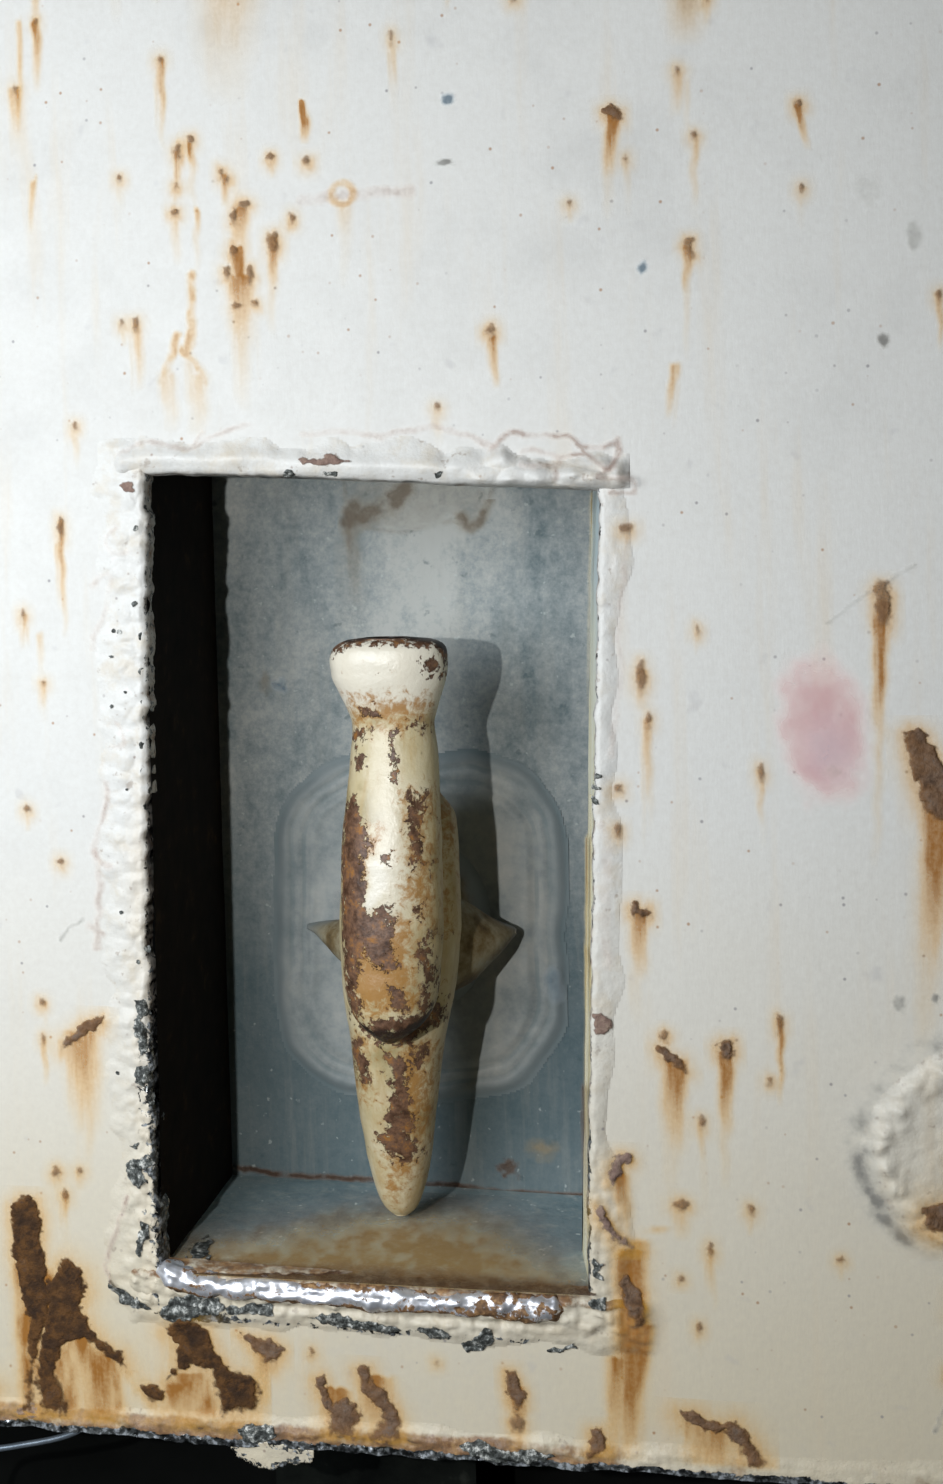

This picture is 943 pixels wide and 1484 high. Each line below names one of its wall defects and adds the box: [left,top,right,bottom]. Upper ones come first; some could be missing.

rust [224,245,257,308]
rust [903,728,943,904]
rust [63,1016,104,1073]
rust [655,1031,686,1106]
rust [719,1040,733,1101]
rust [922,1203,943,1232]
rust [10,1195,123,1414]
rust [189,1223,596,1296]
rust [596,1153,652,1421]
rust [140,1319,285,1416]
rust [316,1365,401,1441]
rust [680,1410,763,1467]